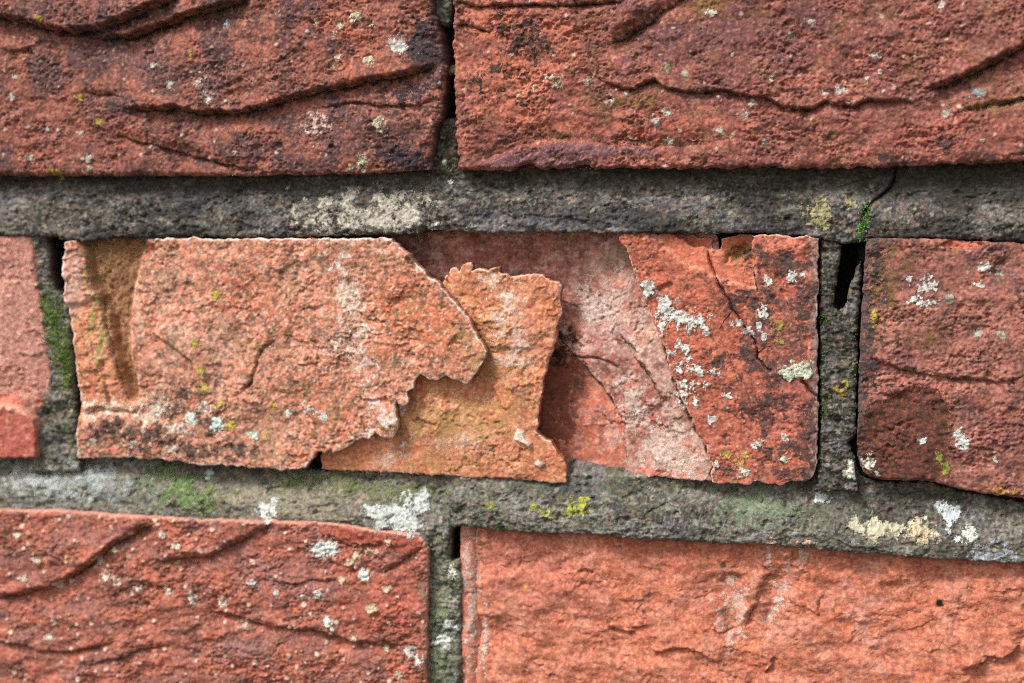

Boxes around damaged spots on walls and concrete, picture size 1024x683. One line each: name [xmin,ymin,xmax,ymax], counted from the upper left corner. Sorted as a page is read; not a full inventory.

water stain [49,302,172,439]
peeling [62,230,821,485]
crack [707,250,812,393]